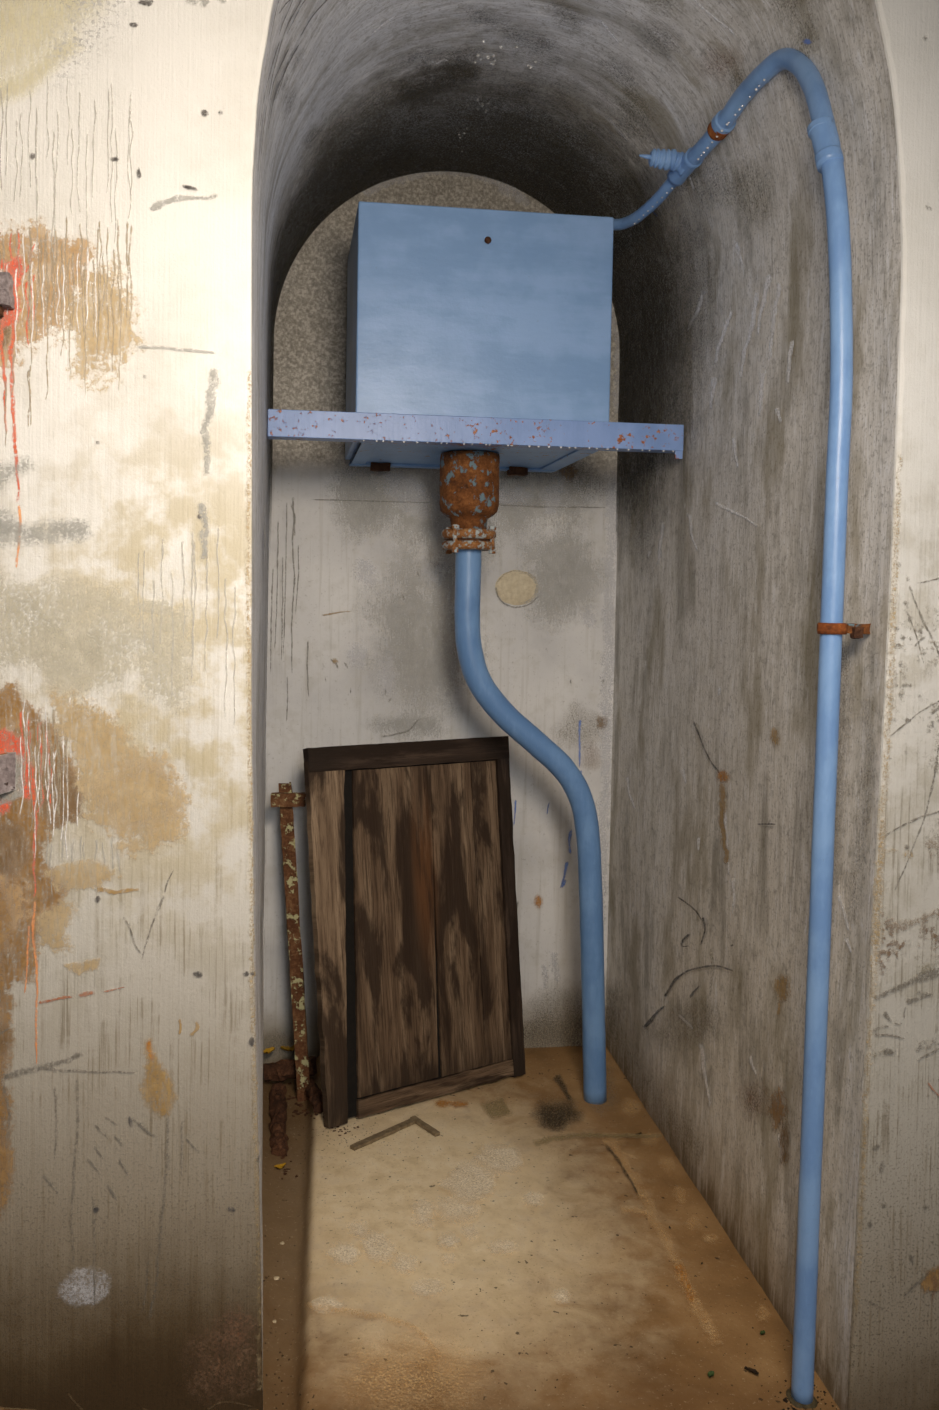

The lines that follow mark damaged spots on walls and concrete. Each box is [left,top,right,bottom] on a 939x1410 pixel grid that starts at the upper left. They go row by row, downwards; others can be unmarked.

rust [0,217,142,567]
crack [908,587,939,654]
rust [0,683,191,1215]
crack [899,748,939,880]